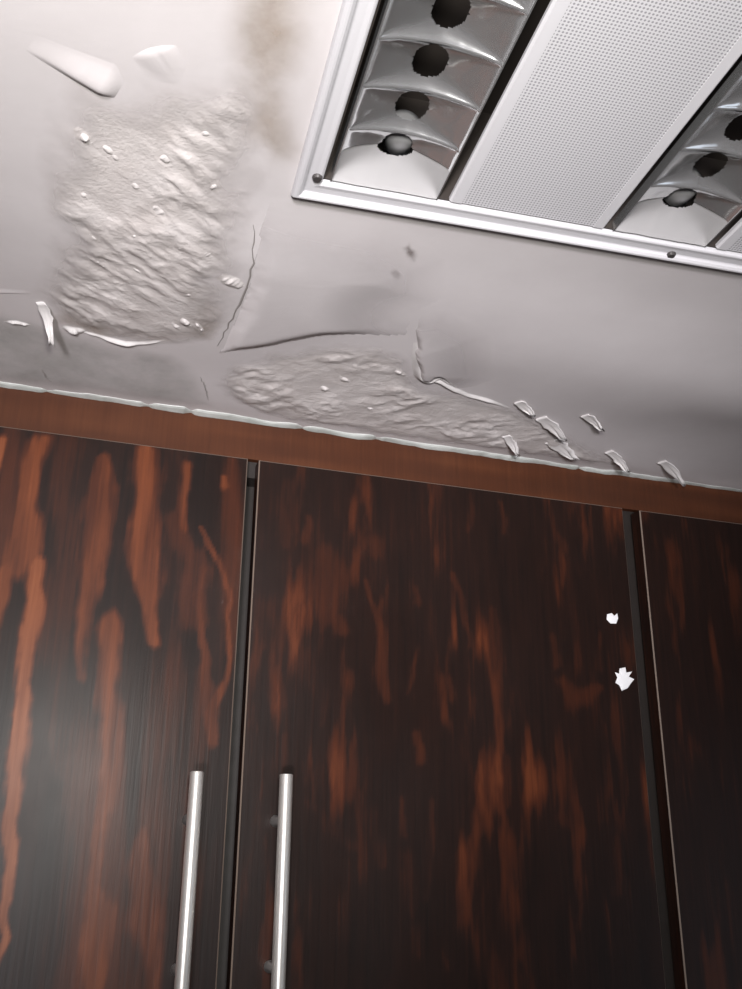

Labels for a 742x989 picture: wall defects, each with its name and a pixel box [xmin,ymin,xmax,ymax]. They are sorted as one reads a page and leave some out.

flaking render [56,98,246,347]
crack [217,225,255,346]
peeling [227,333,630,474]
peeling [657,460,686,487]